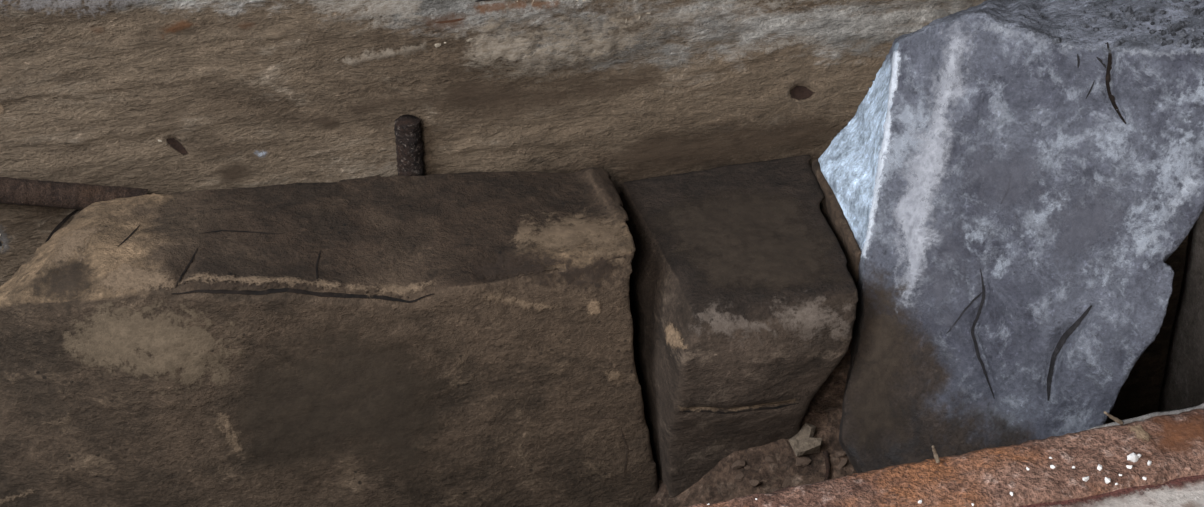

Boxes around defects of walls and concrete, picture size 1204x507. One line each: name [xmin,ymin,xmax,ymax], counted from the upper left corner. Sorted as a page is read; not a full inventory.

crack [1077,42,1126,124]
crack [45,210,79,242]
crack [171,230,434,303]
crack [946,268,995,399]
crack [1047,305,1092,401]